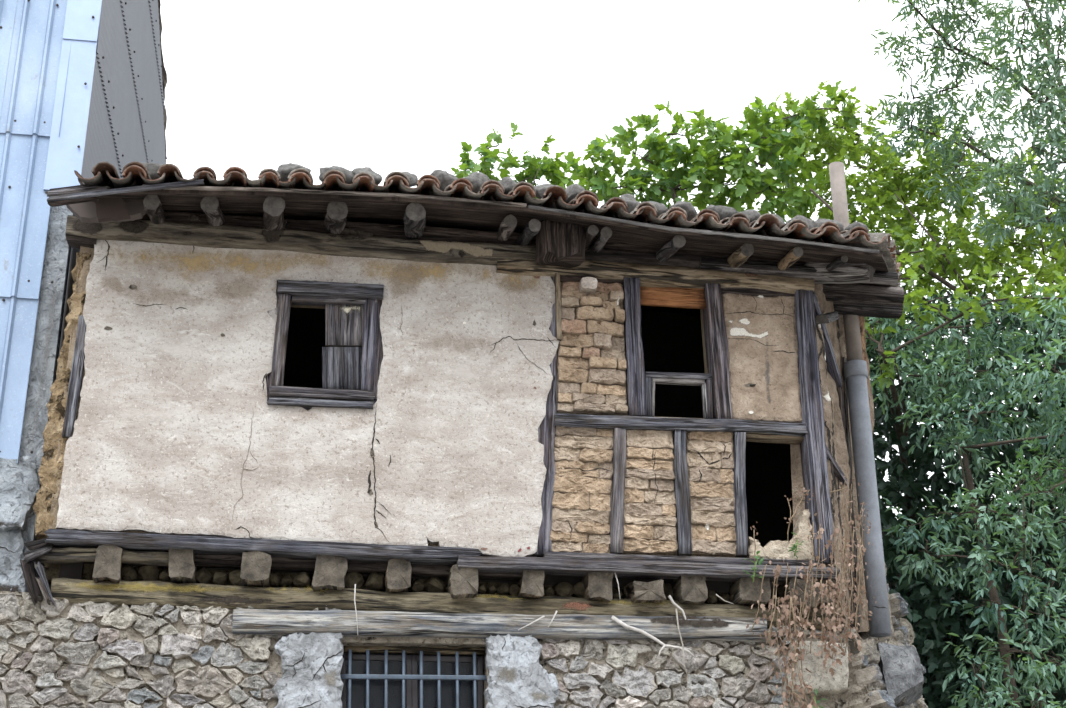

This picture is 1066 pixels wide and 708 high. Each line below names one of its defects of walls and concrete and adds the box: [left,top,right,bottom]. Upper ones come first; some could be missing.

crack [492,336,554,375]
crack [232,425,257,537]
crack [368,405,391,543]